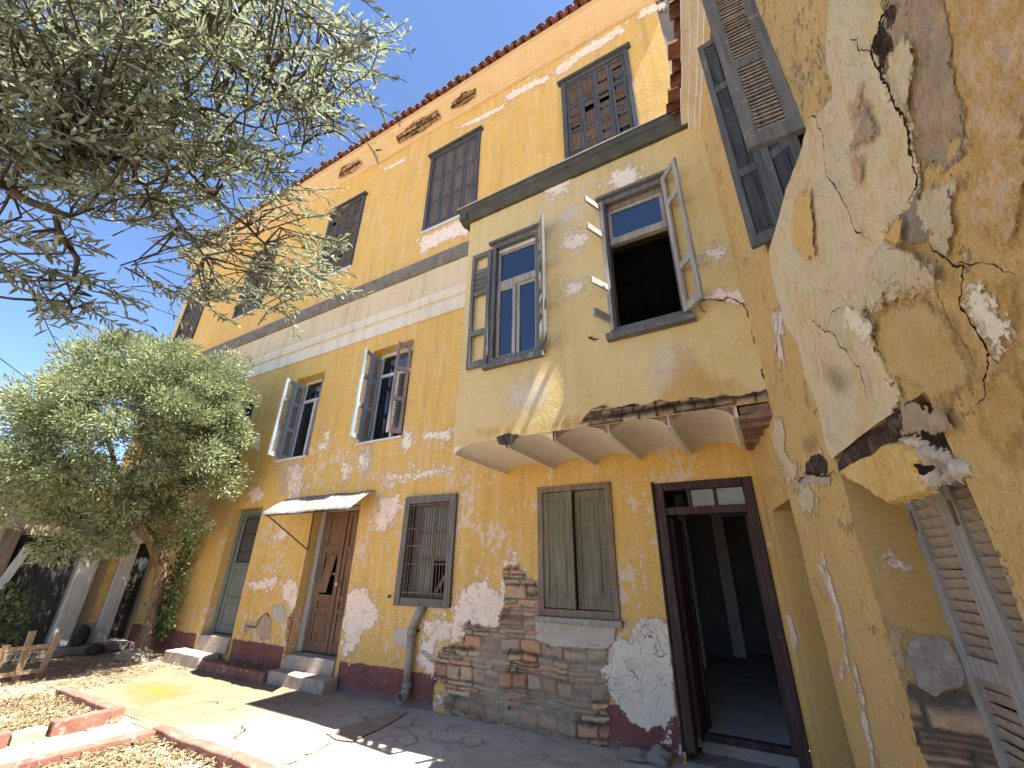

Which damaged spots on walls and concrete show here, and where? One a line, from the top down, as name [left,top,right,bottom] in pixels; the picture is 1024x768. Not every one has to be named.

peeling [415,220,469,255]
peeling [457,0,667,130]
crack [850,2,918,204]
crack [808,115,1014,409]
peeling [838,0,1024,347]
crack [698,297,778,389]
peeling [961,276,1024,462]
peeling [338,426,458,532]
flaking render [576,388,976,518]
peeling [340,580,384,665]
flaking render [415,548,682,755]
flaking render [882,620,1000,768]